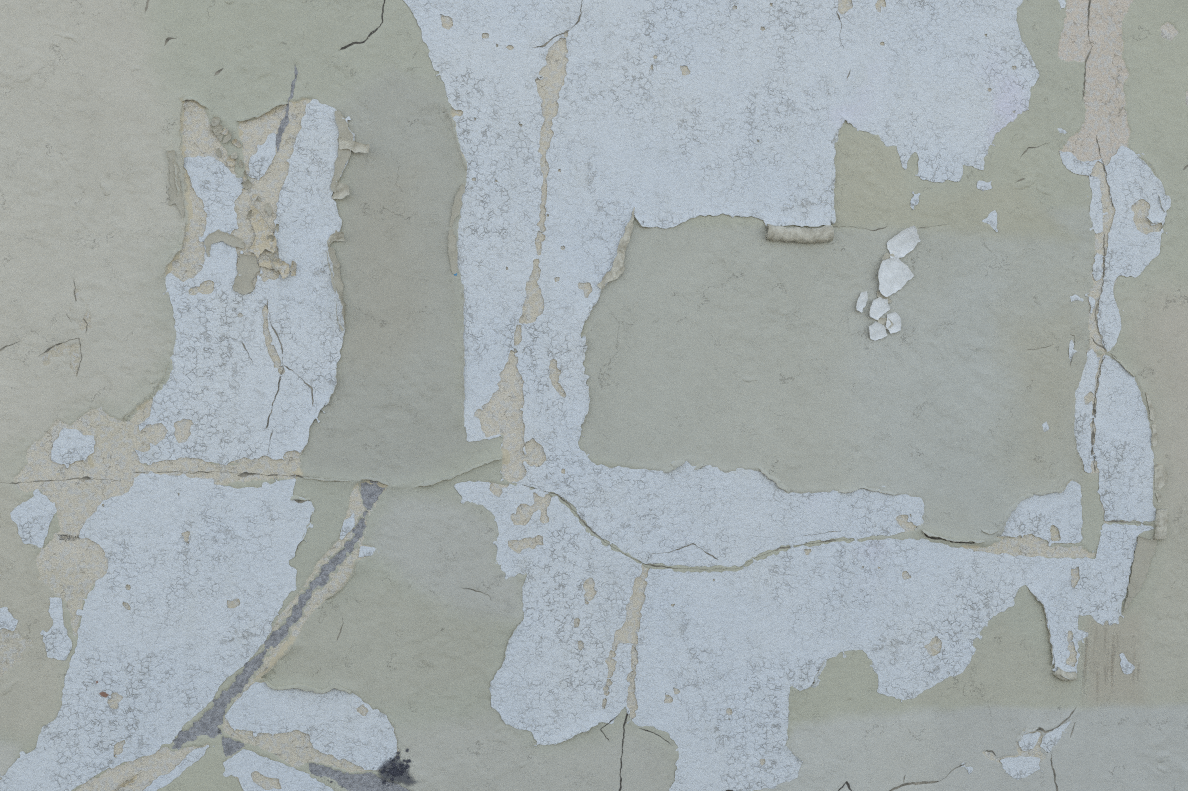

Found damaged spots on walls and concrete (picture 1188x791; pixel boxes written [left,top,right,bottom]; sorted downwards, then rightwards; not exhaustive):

crack [338,0,385,51]
crack [0,283,88,376]
peeling [403,0,1171,791]
peeling [0,96,399,791]
crack [1,302,385,757]
crack [525,485,836,570]
crack [924,533,975,544]
crack [309,763,410,791]